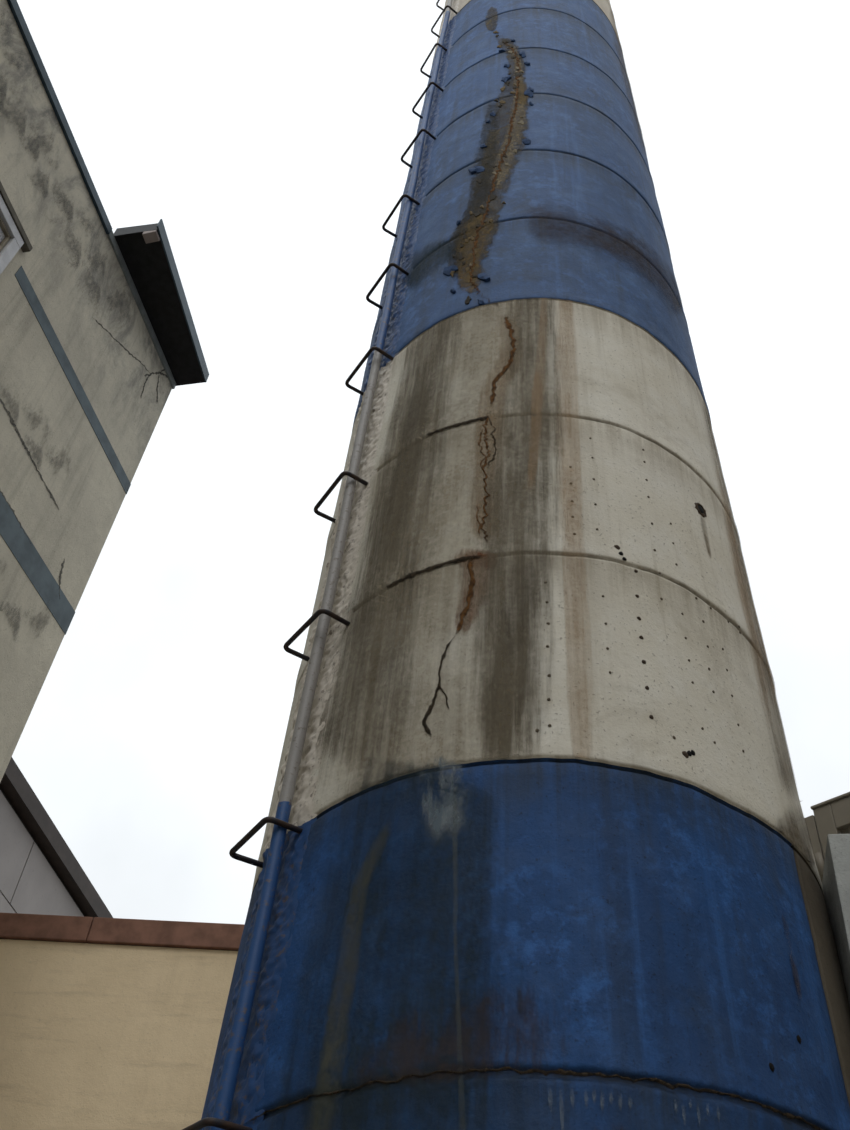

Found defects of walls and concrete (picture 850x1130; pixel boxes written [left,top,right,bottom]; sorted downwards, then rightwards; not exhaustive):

peeling [443,7,534,306]
crack [0,491,29,539]
crack [0,399,59,509]
crack [96,320,168,402]
crack [386,317,520,735]
water stain [706,412,793,781]